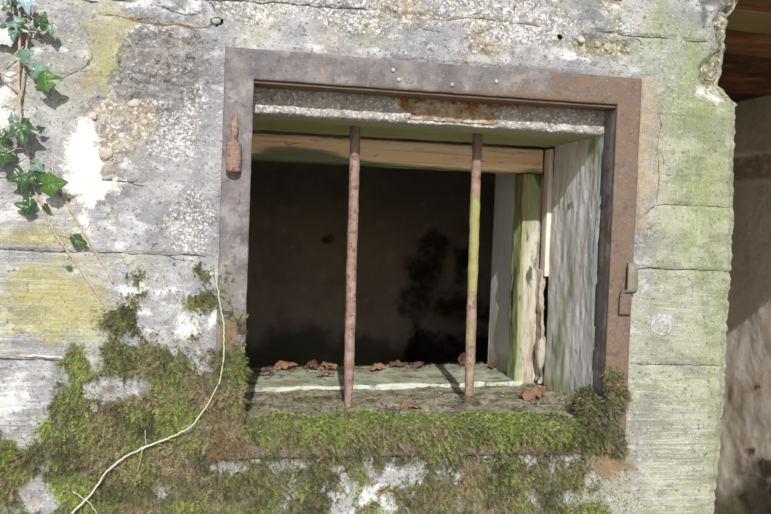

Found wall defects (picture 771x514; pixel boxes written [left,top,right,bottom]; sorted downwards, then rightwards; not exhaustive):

crack [85,0,375,32]
rust [447,93,522,115]
spalling [63,29,209,228]
crack [102,178,145,186]
crack [3,249,206,261]
water stain [399,231,490,365]